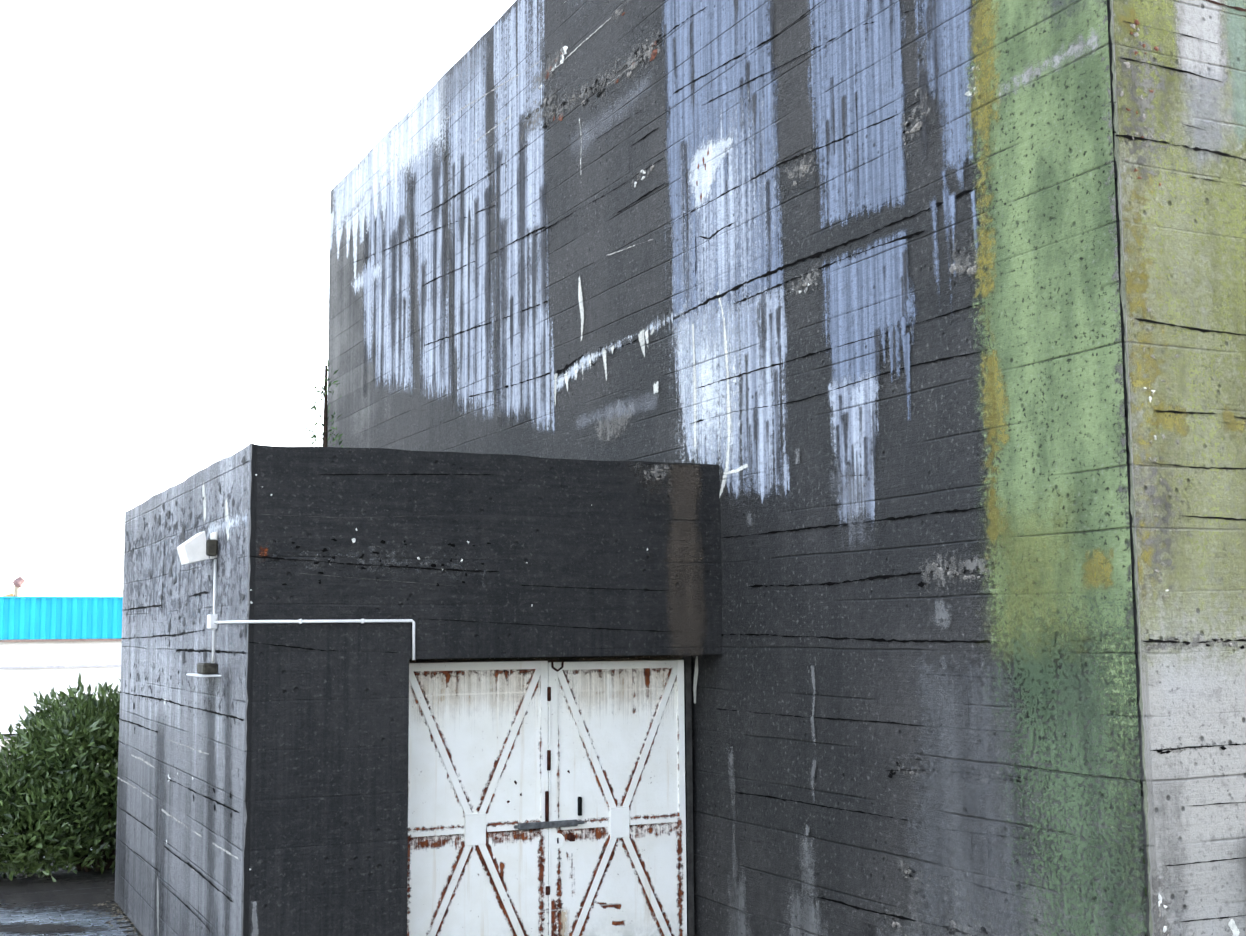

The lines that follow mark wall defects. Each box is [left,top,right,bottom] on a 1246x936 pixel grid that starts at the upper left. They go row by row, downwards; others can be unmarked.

damp [329,0,790,500]
damp [823,231,915,523]
damp [808,0,978,282]
crack [1135,318,1246,336]
damp [1218,0,1246,165]
rust [407,668,684,936]
rust [628,464,707,656]
crack [430,619,1246,732]
crack [887,759,1085,790]
damp [908,519,1068,936]
damp [1083,609,1145,934]
crack [1150,743,1246,751]